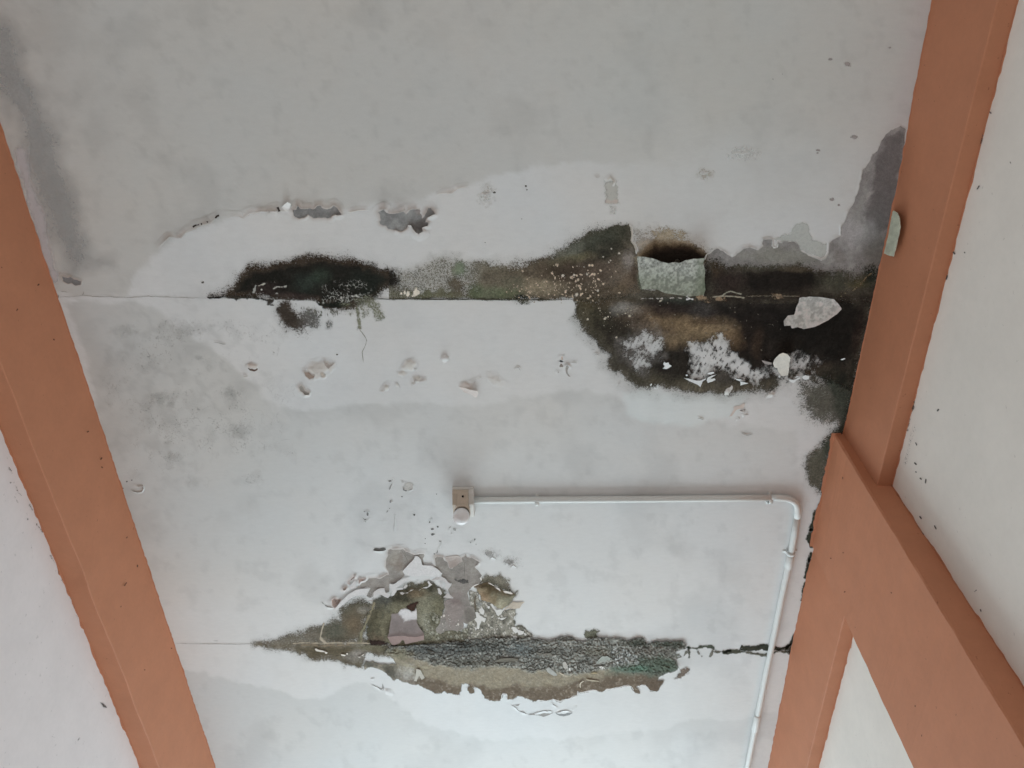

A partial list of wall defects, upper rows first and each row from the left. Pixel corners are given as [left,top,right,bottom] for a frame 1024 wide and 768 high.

peeling [154,182,469,249]
peeling [594,174,618,213]
spalling [637,123,906,329]
water stain [207,221,879,601]
peeling [320,478,517,646]